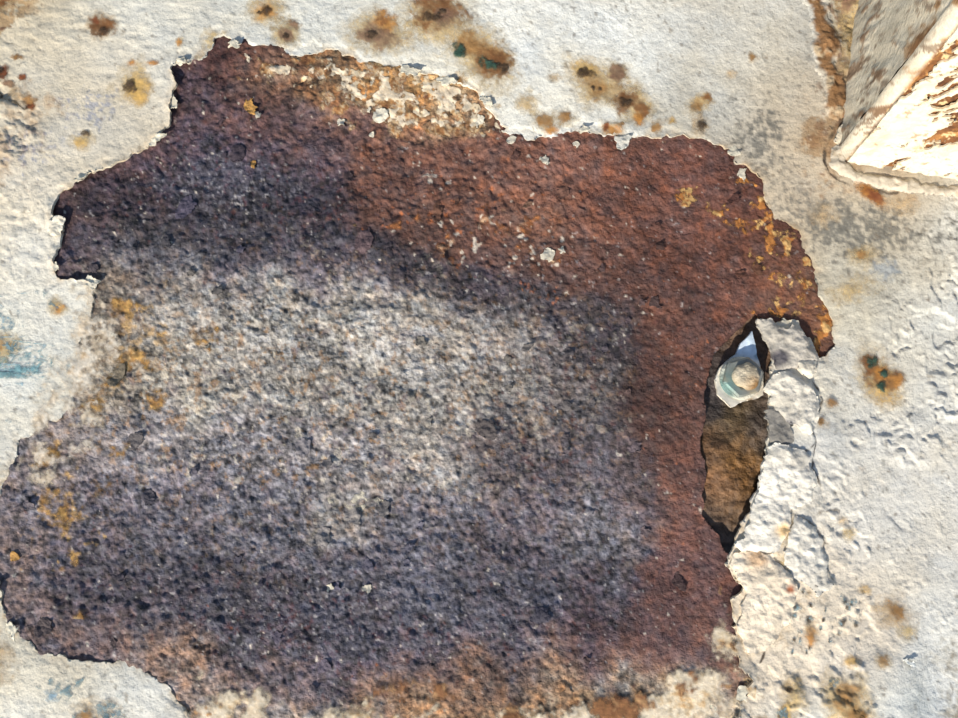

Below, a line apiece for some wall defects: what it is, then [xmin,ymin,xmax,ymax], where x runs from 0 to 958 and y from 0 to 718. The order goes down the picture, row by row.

rust [250,0,299,44]
rust [354,0,515,87]
rust [0,54,37,110]
peeling [348,76,380,104]
rust [517,97,572,134]
rust [572,60,674,136]
peeling [229,143,245,162]
peeling [175,195,197,219]
rust [859,354,904,404]
peeling [475,418,497,440]
spalling [700,315,771,553]
peeling [529,606,551,624]